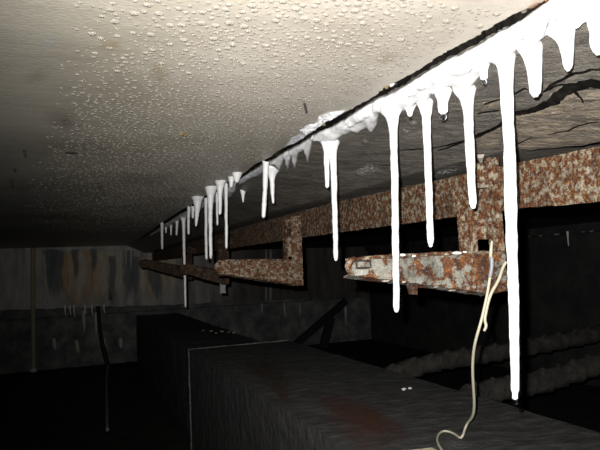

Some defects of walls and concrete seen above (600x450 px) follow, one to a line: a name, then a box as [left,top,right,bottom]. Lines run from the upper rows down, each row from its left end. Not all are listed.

efflorescence [150,0,600,236]
crack [227,0,549,184]
crack [405,68,600,151]
crack [138,195,207,241]
corrosion [138,256,176,297]